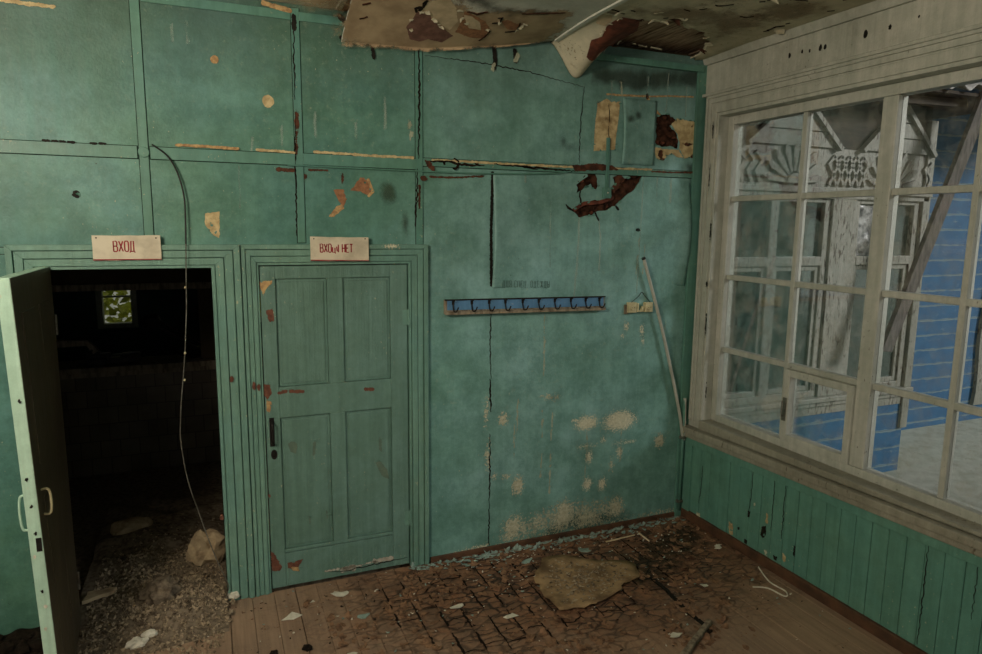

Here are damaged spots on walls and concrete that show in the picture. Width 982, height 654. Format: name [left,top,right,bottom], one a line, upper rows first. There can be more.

peeling [0,0,56,9]
water stain [337,0,573,52]
peeling [406,0,565,72]
crack [603,0,845,34]
peeling [593,93,694,151]
peeling [313,150,414,159]
spalling [432,111,695,221]
peeling [205,212,220,238]
peeling [329,177,374,217]
crack [486,315,494,412]
peeling [445,394,673,553]
crack [382,437,698,654]